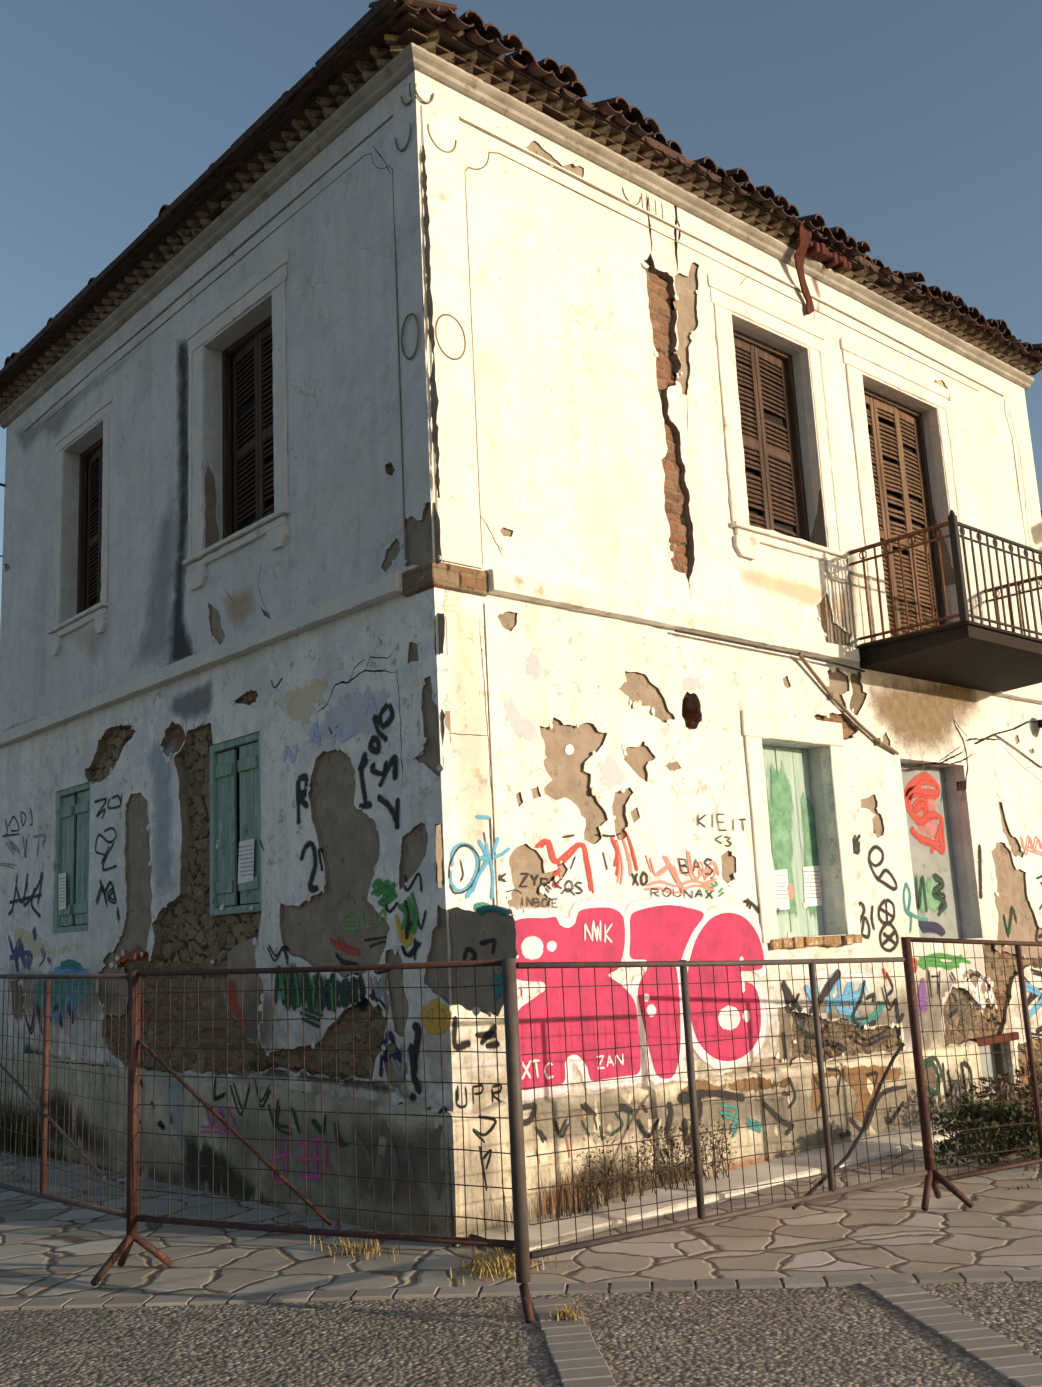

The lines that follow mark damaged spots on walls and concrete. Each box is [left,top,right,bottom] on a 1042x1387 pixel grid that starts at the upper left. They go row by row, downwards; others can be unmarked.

flaking render [641,260,697,586]
damp [171,344,192,662]
flaking render [92,722,136,782]
flaking render [231,685,260,705]
peeling [591,751,627,796]
spalling [632,676,701,730]
flaking render [814,702,857,746]
spalling [612,808,639,832]
flaking render [100,726,390,1079]
damp [39,1093,105,1150]
damp [140,1087,269,1204]